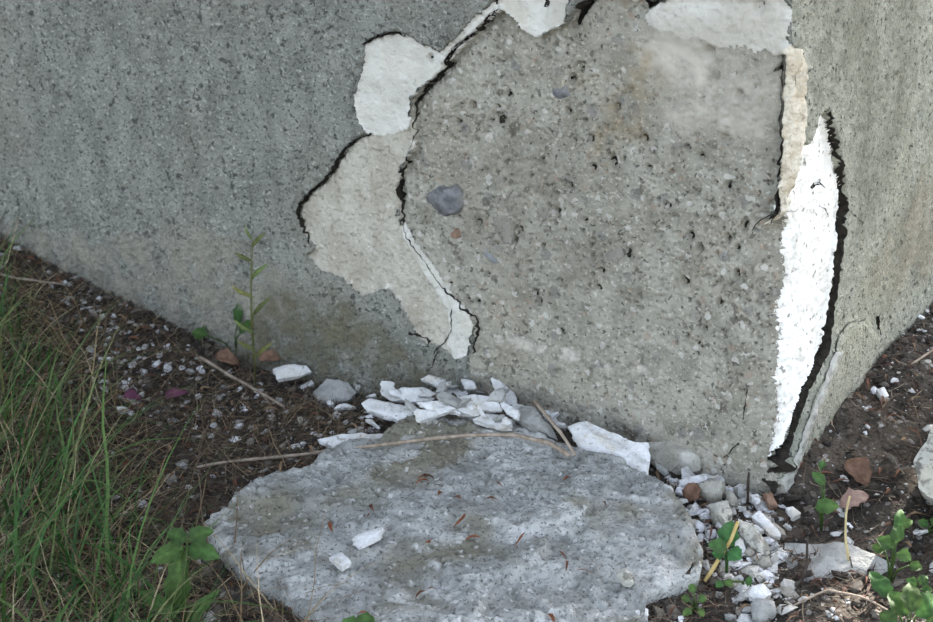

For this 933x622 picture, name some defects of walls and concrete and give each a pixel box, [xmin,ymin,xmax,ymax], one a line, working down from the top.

crack [363,32,405,45]
crack [576,0,594,25]
crack [645,0,660,8]
crack [296,133,372,247]
crack [396,0,499,375]
flaking render [302,0,841,540]
crack [753,54,796,229]
crack [762,111,864,494]